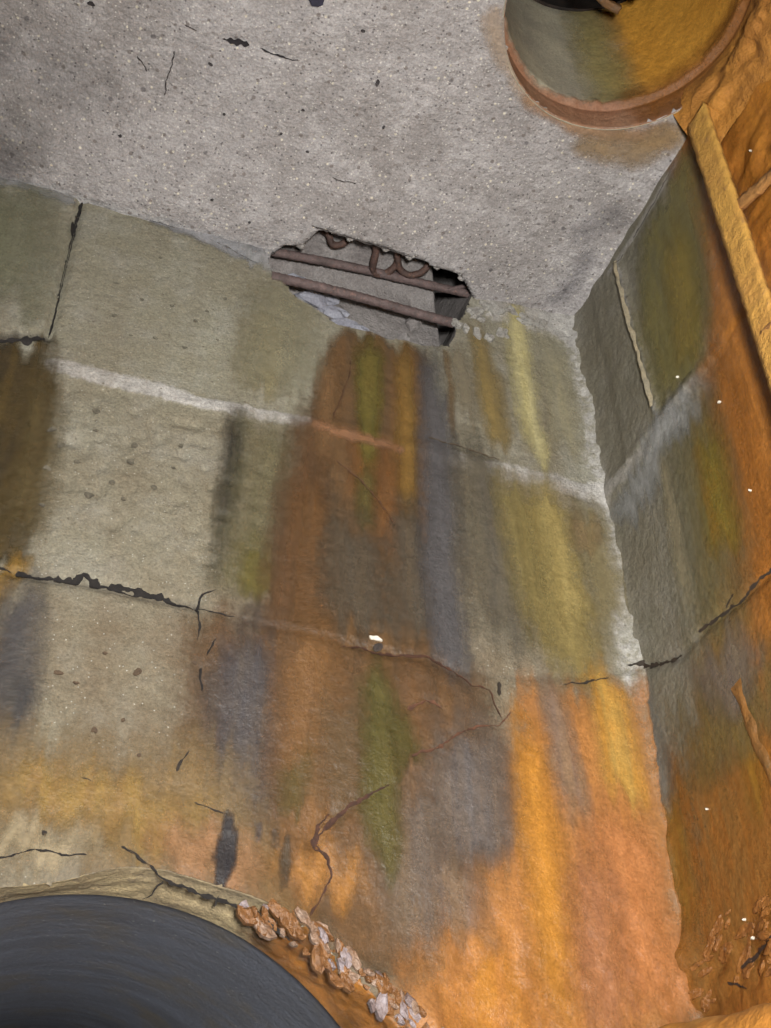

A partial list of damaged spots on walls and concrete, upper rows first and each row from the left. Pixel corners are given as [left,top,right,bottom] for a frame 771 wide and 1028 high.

crack [0,202,83,346]
spalling [268,229,549,347]
corrosion [486,0,771,699]
water stain [0,340,56,562]
corrosion [266,328,449,684]
crack [0,567,234,691]
crack [564,655,682,685]
crack [0,830,87,859]
crack [121,846,291,941]
flaking render [236,898,444,1028]
corrosion [256,672,771,1028]
spalling [688,895,771,1013]